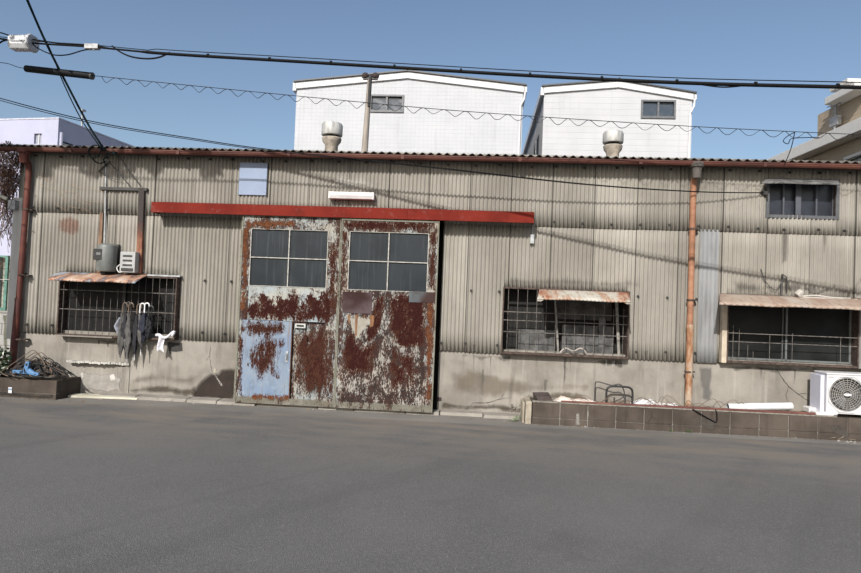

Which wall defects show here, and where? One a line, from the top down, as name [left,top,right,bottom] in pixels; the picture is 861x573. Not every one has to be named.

corrosion [239,219,296,310]
corrosion [327,220,436,312]
corrosion [238,326,288,400]
corrosion [348,315,374,339]
corrosion [383,303,435,402]